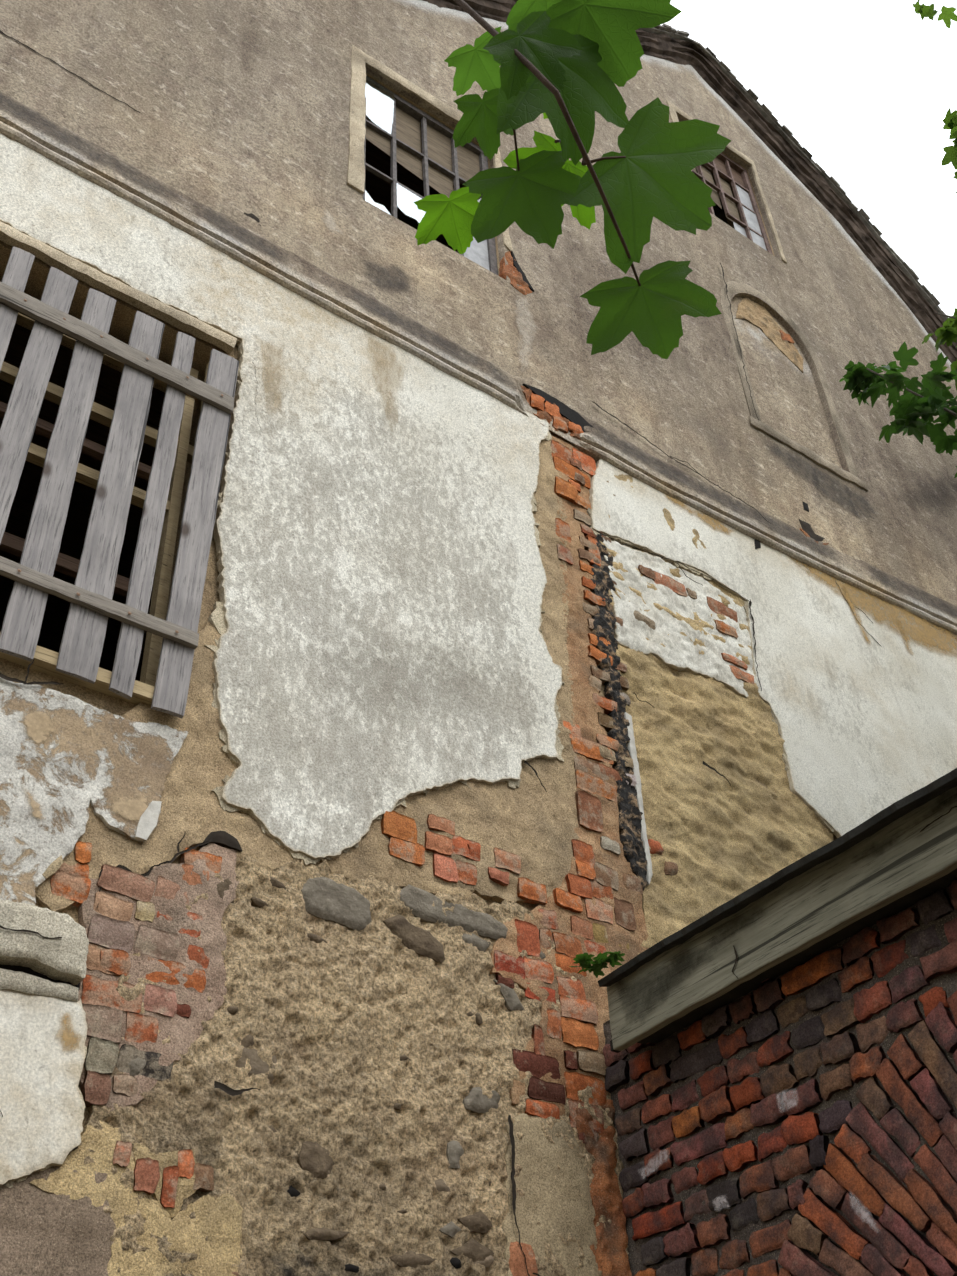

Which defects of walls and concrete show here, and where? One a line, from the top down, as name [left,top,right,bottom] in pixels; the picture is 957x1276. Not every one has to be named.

flaking render [499,251,534,295]
spalling [523,383,594,432]
flaking render [0,434,834,1276]
crack [508,1115,541,1276]